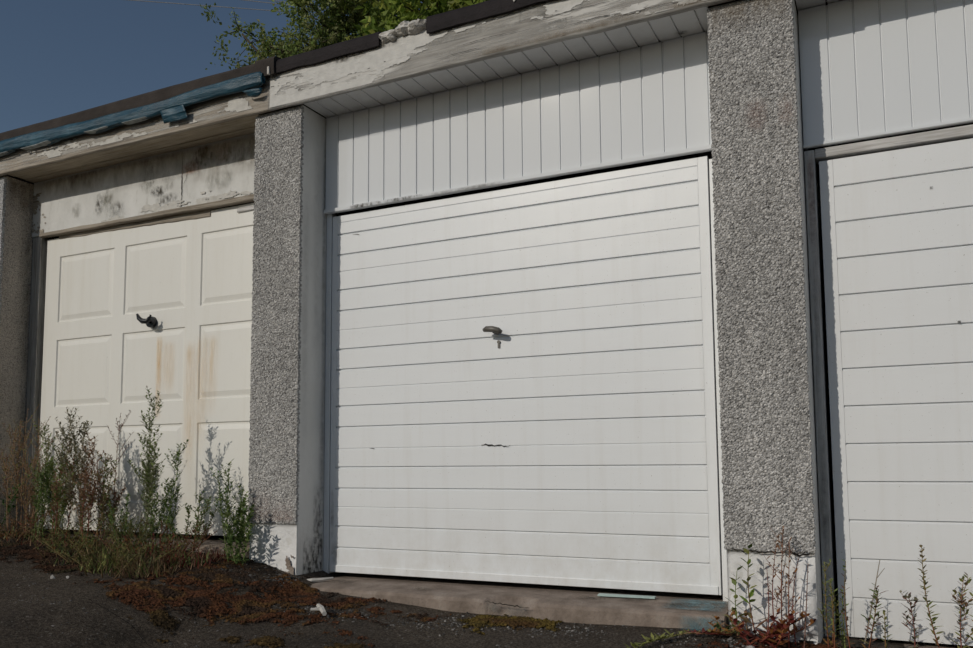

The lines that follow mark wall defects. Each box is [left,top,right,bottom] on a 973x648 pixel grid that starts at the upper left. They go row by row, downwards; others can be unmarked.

peeling [270,0,707,108]
peeling [0,95,252,170]